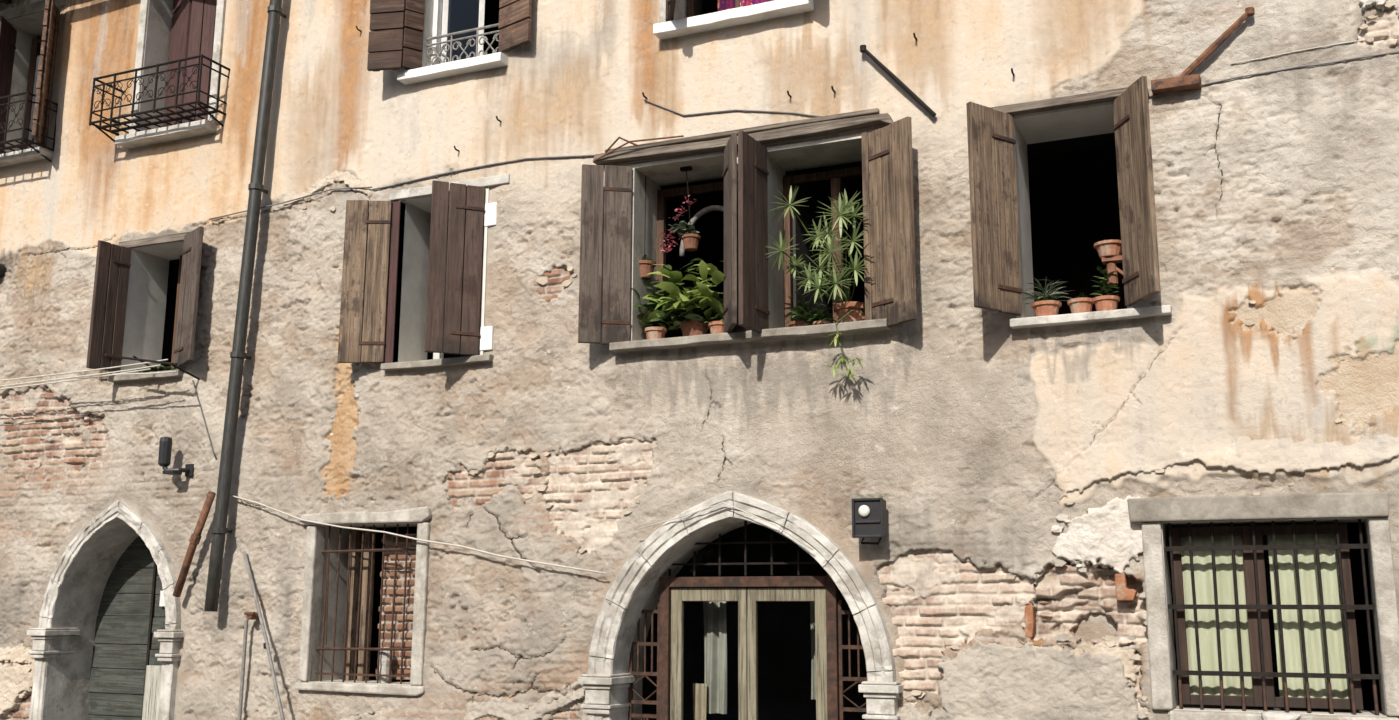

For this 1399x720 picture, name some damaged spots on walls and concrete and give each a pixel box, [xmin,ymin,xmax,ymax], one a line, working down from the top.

spalling [1356,2,1399,51]
rust [1225,287,1310,363]
spalling [0,386,110,474]
flaking render [319,326,361,501]
crack [702,374,732,478]
spalling [443,437,657,557]
spalling [877,549,1150,720]
spalling [0,694,32,720]